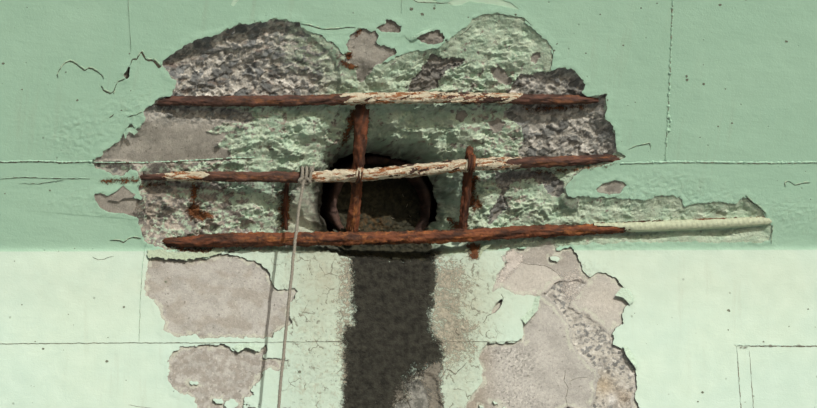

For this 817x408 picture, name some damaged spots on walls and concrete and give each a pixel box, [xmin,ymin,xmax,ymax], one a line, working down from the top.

crack [57,50,161,94]
rust [342,110,355,147]
spalling [92,0,764,339]
rust [186,182,214,222]
rust [277,183,292,230]
rust [469,175,482,211]
rust [466,243,481,260]
damp [331,250,480,408]
peeling [428,224,772,408]
peeling [167,344,288,408]
peeling [393,370,444,408]